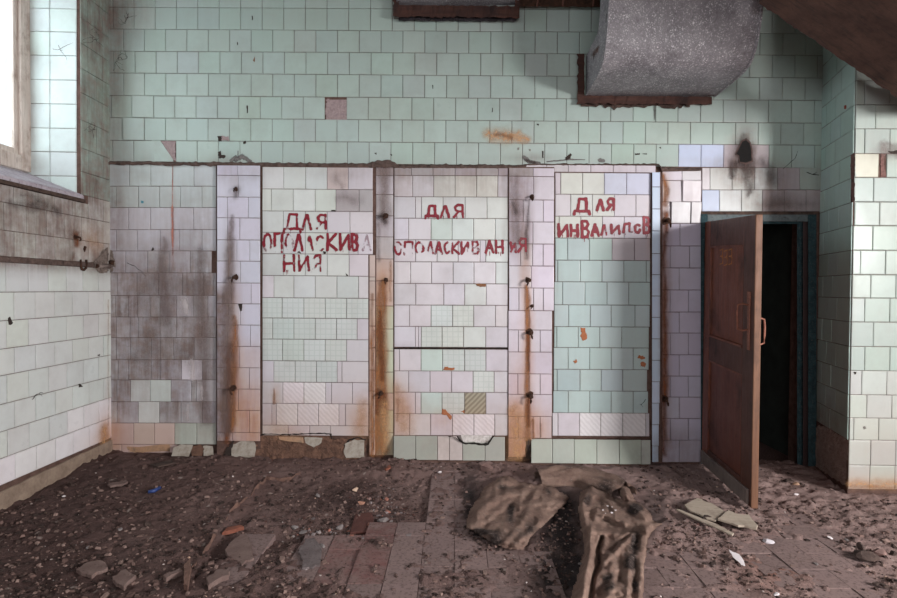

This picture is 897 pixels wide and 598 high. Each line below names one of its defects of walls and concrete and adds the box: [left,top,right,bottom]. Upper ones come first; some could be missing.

spalling [161,141,176,161]
spalling [325,99,347,120]
corrosion [486,131,529,141]
corrosion [225,316,237,442]
corrosion [370,280,388,456]
corrosion [513,285,534,457]